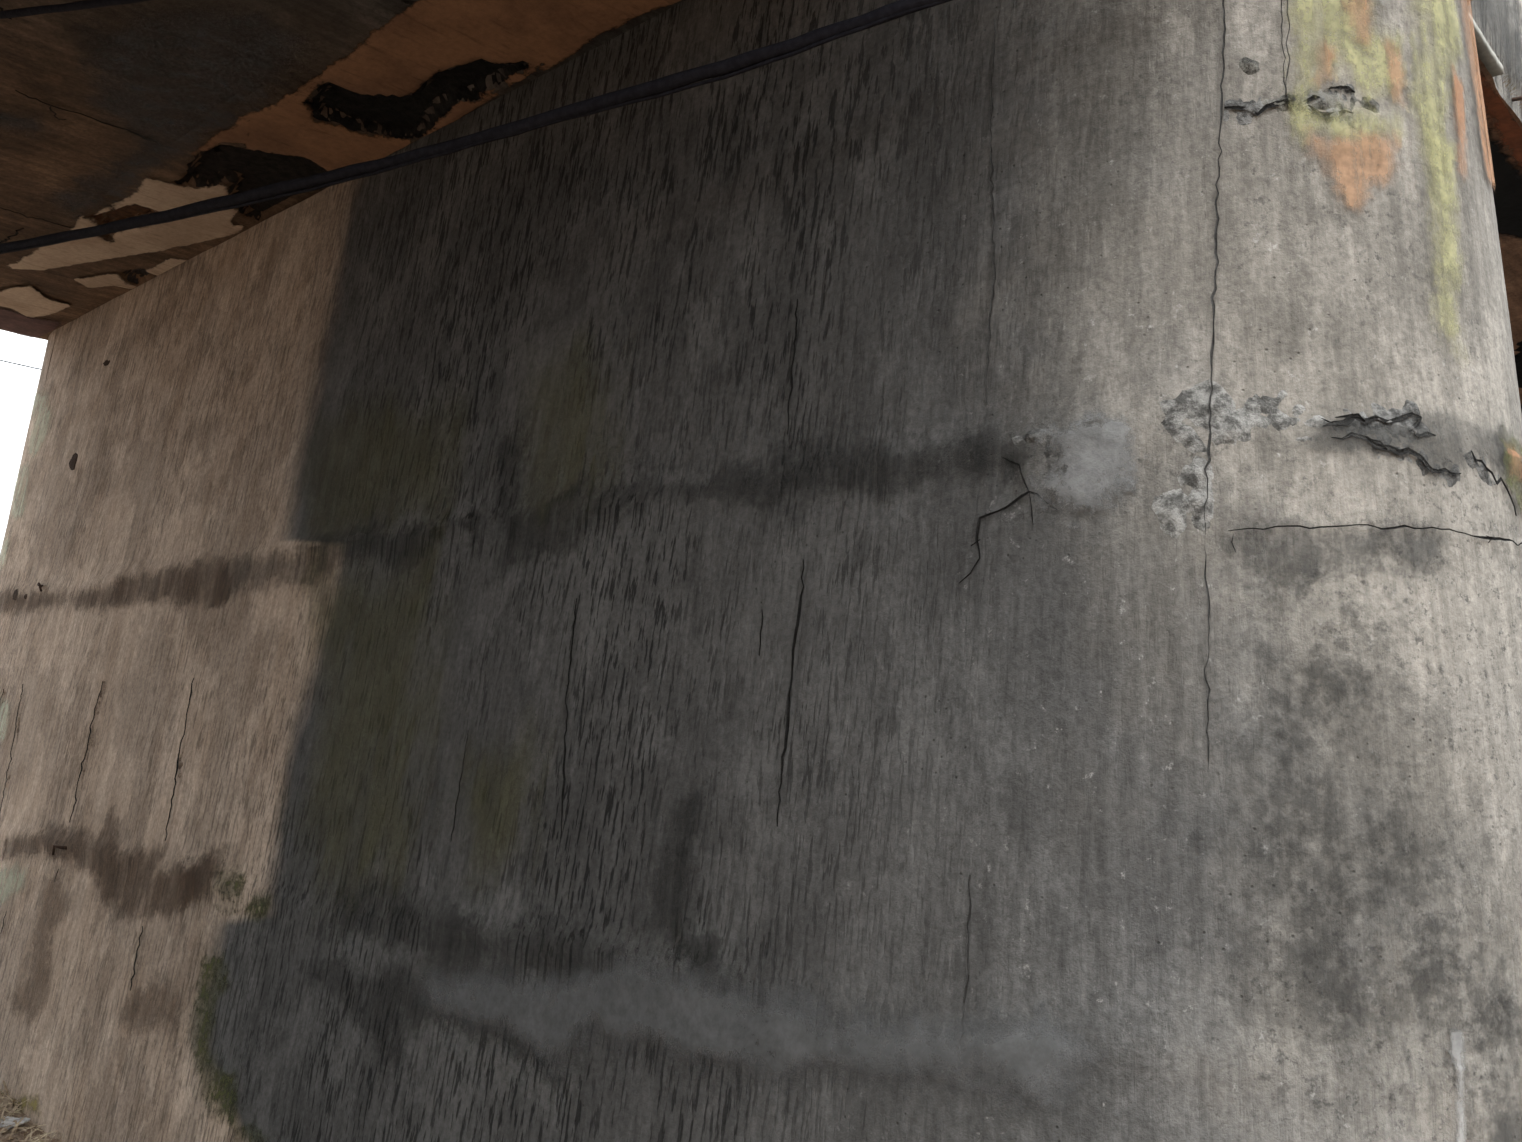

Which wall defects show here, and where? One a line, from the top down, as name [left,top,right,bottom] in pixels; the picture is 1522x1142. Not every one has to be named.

spalling [1239,57,1260,75]
crack [1223,75,1356,129]
spalling [1261,89,1384,113]
rust [1454,0,1522,184]
peeling [0,0,681,318]
spalling [1514,341,1522,388]
crack [959,457,1059,583]
spalling [1151,379,1327,538]
crack [1228,399,1522,552]
leakage [75,558,229,610]
leakage [0,809,210,919]
leakage [1451,1031,1465,1142]